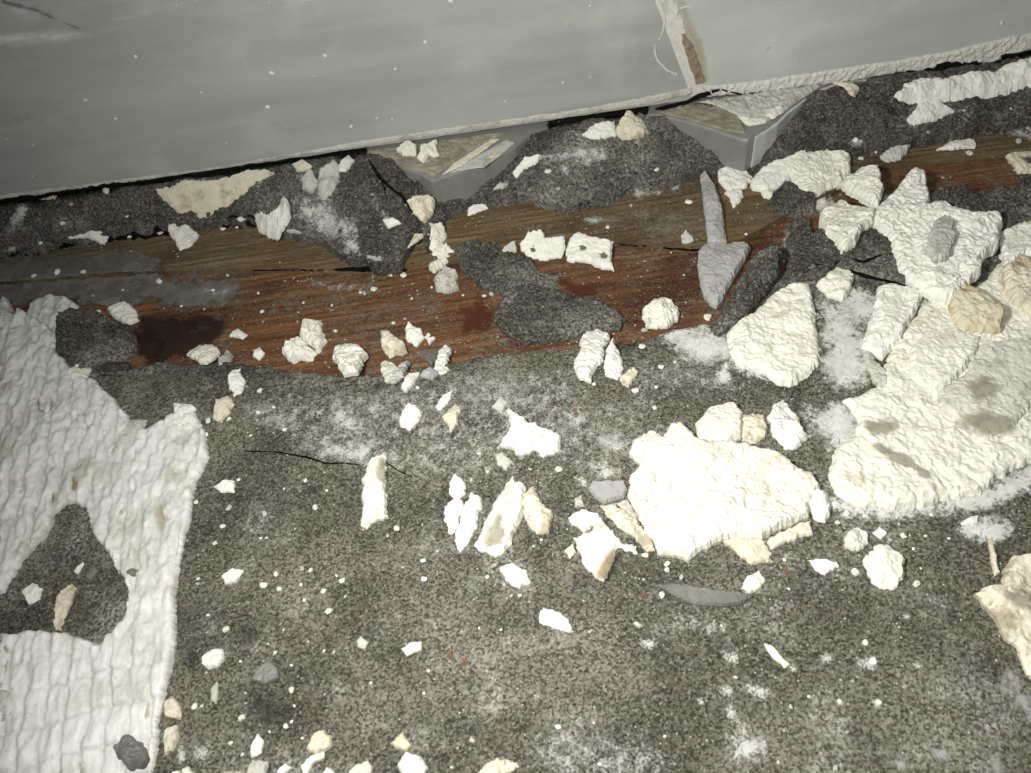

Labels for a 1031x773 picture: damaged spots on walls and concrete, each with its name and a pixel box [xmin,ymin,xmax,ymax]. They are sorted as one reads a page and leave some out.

spalling [907,98,955,126]
spalling [396,140,439,163]
spalling [880,144,911,163]
spalling [936,138,976,151]
spalling [493,154,541,190]
spalling [816,267,854,303]
spalling [108,301,140,325]
damp [136,313,223,365]
crack [244,451,360,466]
spalling [22,583,44,605]
spalling [53,562,100,631]
spalling [163,696,183,757]